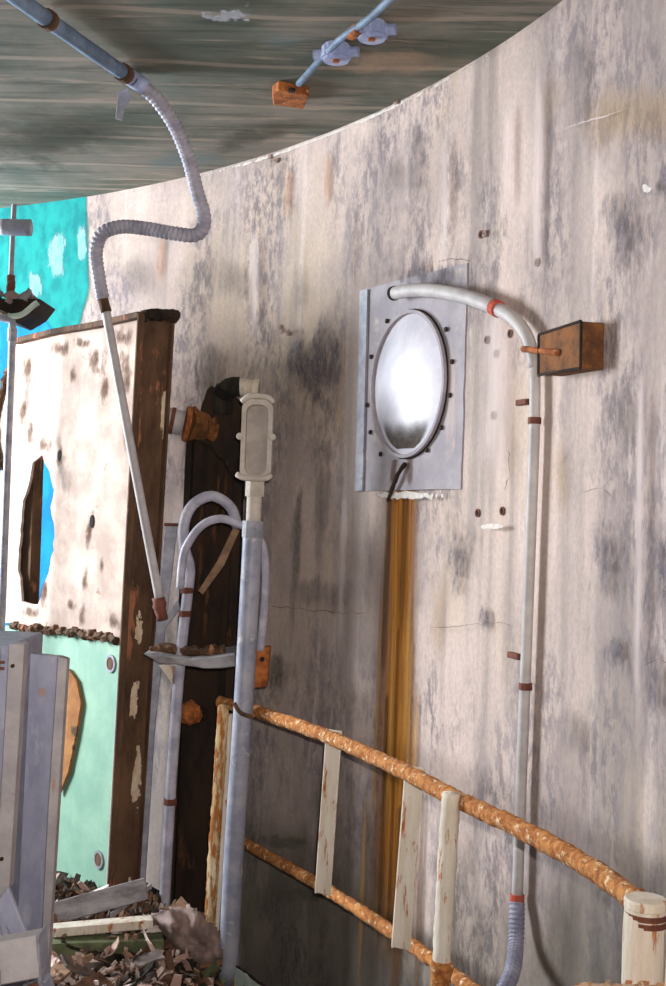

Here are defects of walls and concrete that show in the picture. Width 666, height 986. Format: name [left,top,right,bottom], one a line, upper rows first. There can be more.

peeling [0,197,89,388]
water stain [290,320,341,401]
peeling [39,462,55,600]
rust [381,490,414,764]
rust [378,770,404,923]